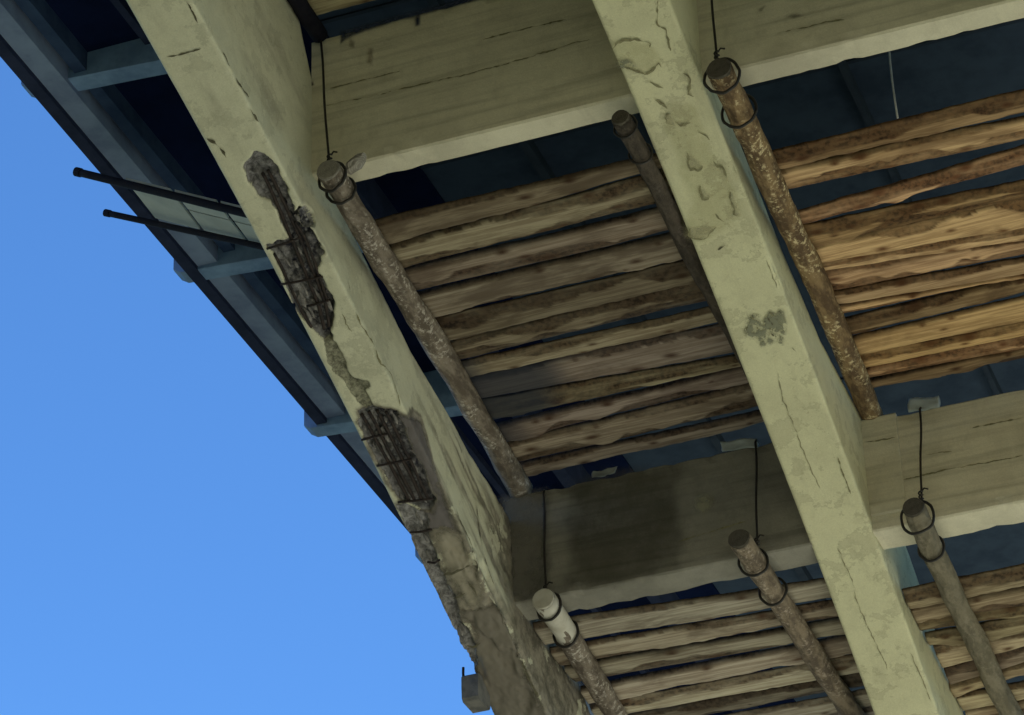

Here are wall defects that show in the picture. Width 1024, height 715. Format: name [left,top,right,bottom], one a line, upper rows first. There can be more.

peeling [619,60,689,127]
peeling [745,310,786,346]
spalling [243,151,546,715]
crack [778,379,820,487]
water stain [502,492,549,599]
crack [838,550,887,668]